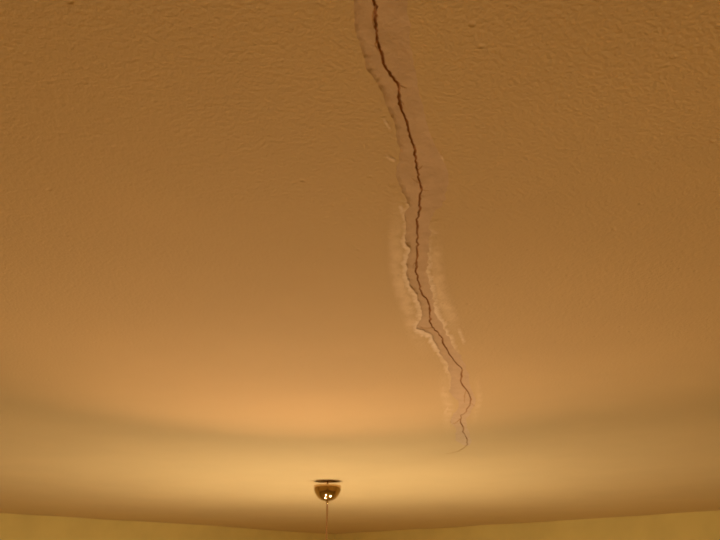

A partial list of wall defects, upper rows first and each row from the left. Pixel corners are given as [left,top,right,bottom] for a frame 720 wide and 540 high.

spalling [353,0,485,446]
crack [372,0,473,454]